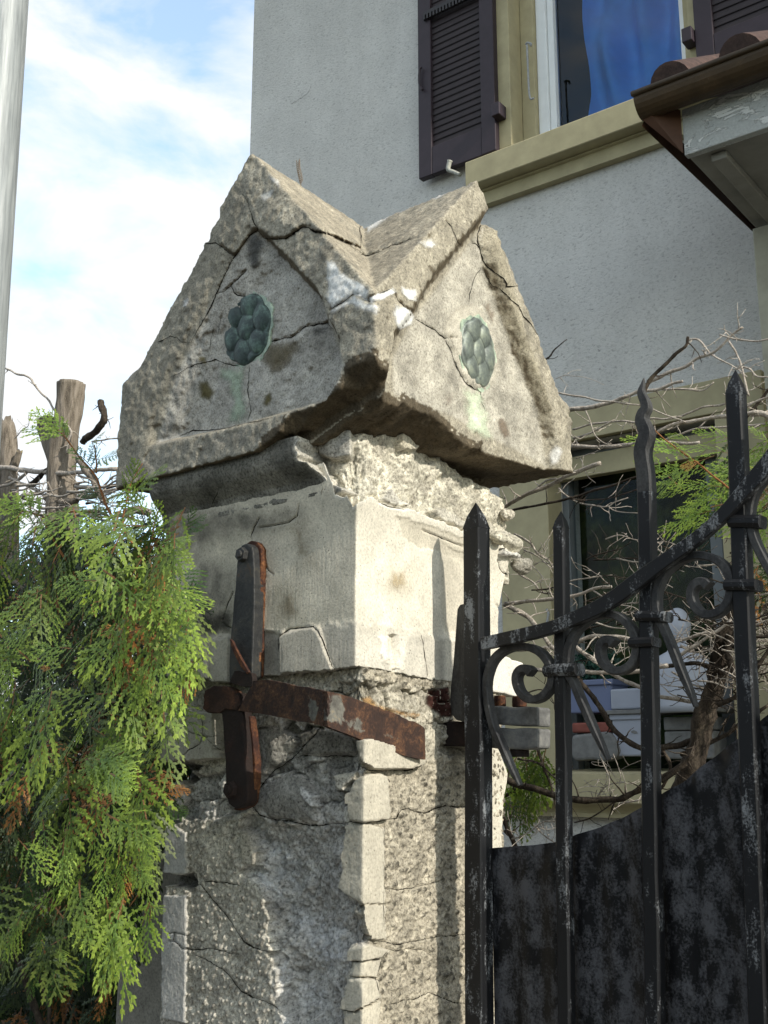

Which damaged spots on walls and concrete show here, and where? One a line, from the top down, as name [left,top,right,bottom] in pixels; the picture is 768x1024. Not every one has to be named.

crack [158,199,413,437]
crack [272,289,485,409]
crack [447,214,537,334]
spalling [260,348,521,585]
corrosion [234,716,262,811]
crack [253,727,465,839]
spalling [331,679,465,759]
crack [172,881,279,1010]
crack [345,864,464,1012]